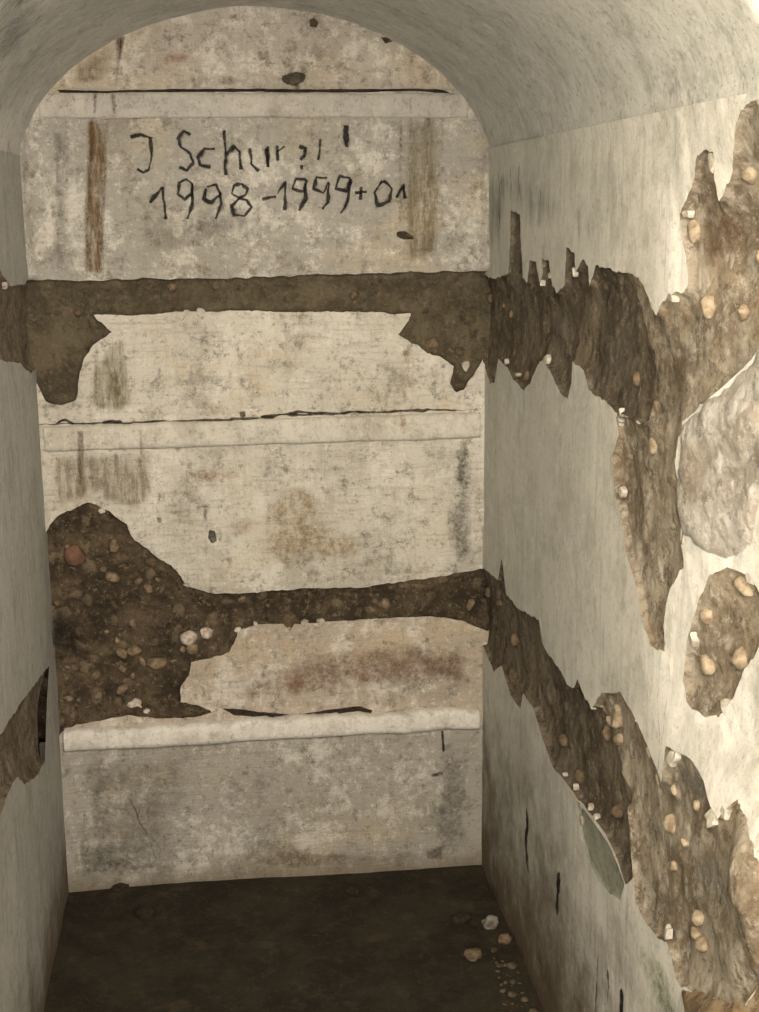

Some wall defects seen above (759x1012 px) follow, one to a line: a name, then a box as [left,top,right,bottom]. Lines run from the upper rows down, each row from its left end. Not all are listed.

corrosion [86,122,105,272]
crack [39,408,478,425]
flaking render [0,100,759,717]
flaking render [0,502,759,1003]